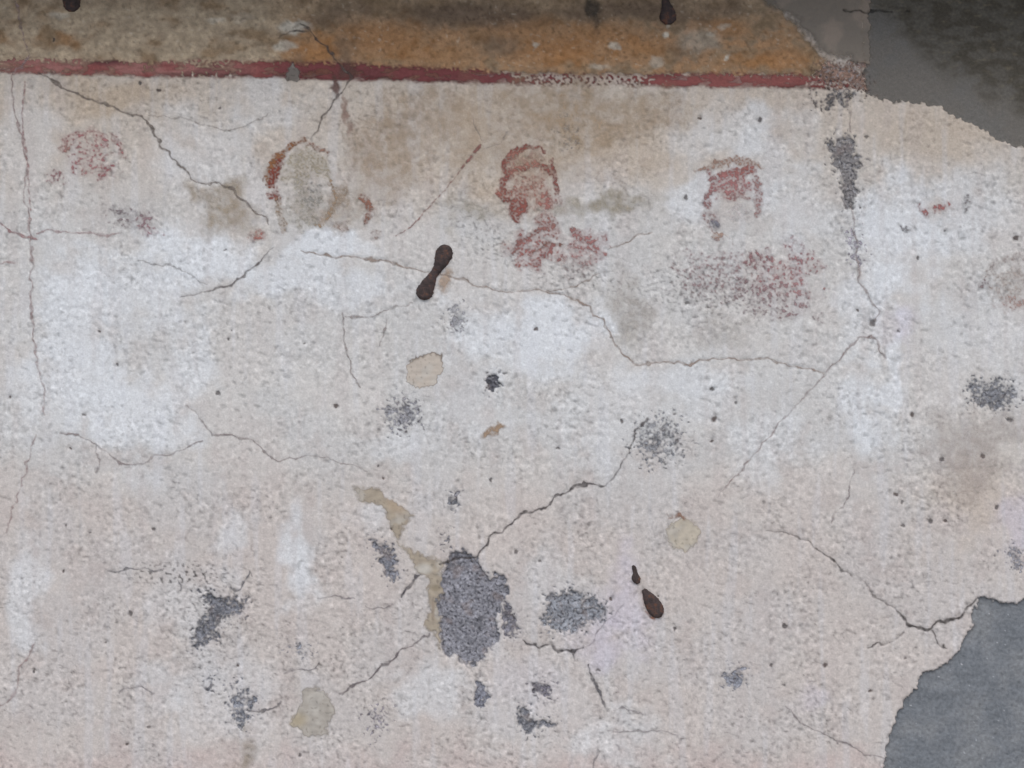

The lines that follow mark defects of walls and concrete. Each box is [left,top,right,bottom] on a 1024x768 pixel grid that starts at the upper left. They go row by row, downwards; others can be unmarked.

crack [48,77,268,223]
flaking render [824,133,868,210]
crack [535,237,881,377]
flaking render [963,375,1024,421]
crack [444,463,622,563]
flaking render [369,528,404,583]
flaking render [190,588,252,650]
flaking render [436,534,520,667]
flaking render [539,586,612,639]
crack [897,599,976,648]
crack [344,633,430,693]
crack [523,640,638,732]